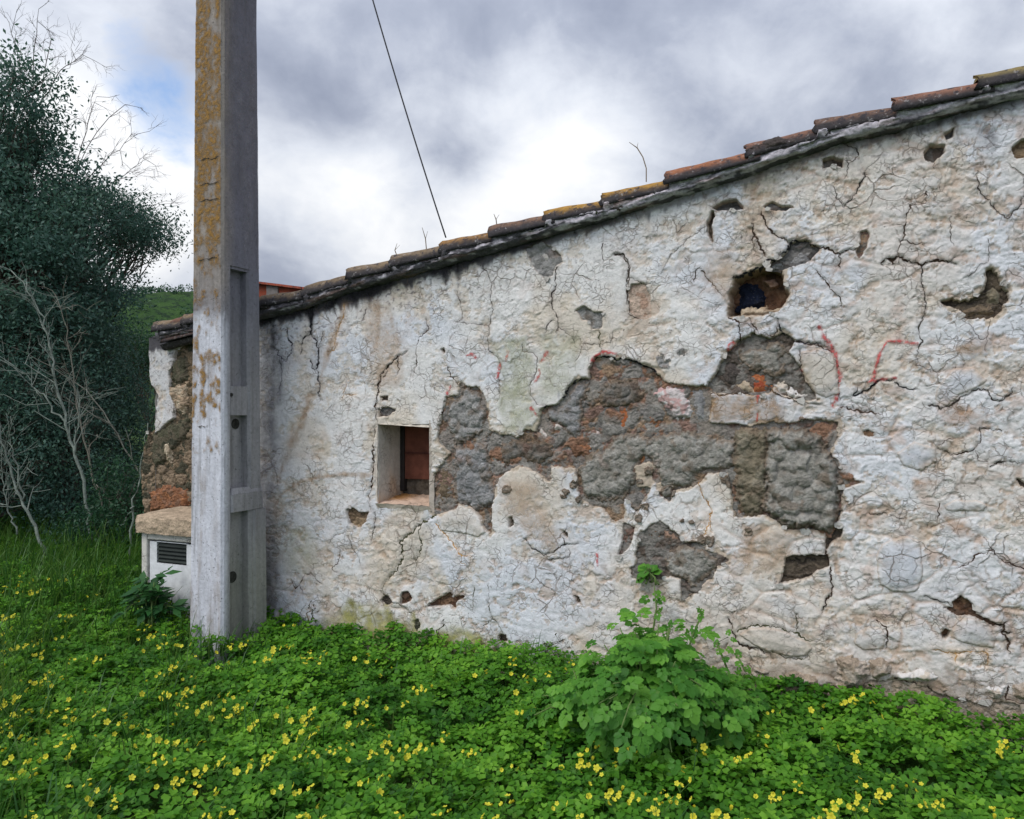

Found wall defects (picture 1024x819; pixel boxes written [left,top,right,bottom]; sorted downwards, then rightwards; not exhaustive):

crack [454,226,706,408]
spalling [733,241,819,319]
crack [693,163,1013,415]
flaking render [941,270,1009,319]
spalling [141,343,193,513]
crack [274,305,429,592]
flaking render [434,333,861,601]
crack [383,514,504,635]
flaking render [431,592,465,607]
crack [728,614,814,660]
flaking render [947,596,995,626]
crack [933,621,1011,668]